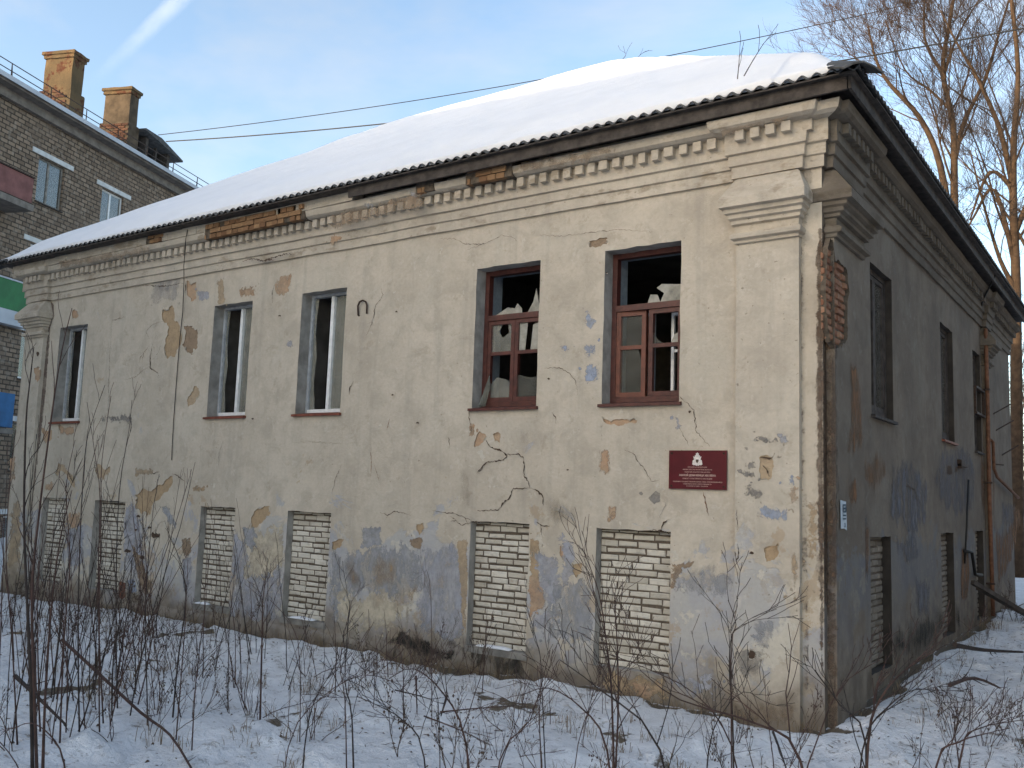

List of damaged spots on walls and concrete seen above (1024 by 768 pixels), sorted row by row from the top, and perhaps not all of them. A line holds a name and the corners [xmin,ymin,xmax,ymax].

flaking render [204,204,305,240]
peeling [275,274,292,296]
flaking render [820,238,850,349]
spalling [162,306,198,359]
spalling [601,416,637,426]
crack [437,417,549,535]
spalling [737,434,803,503]
spalling [134,468,192,591]
peeling [230,506,284,622]
peeling [528,533,593,645]
spalling [749,544,779,561]
leakage [471,653,522,676]